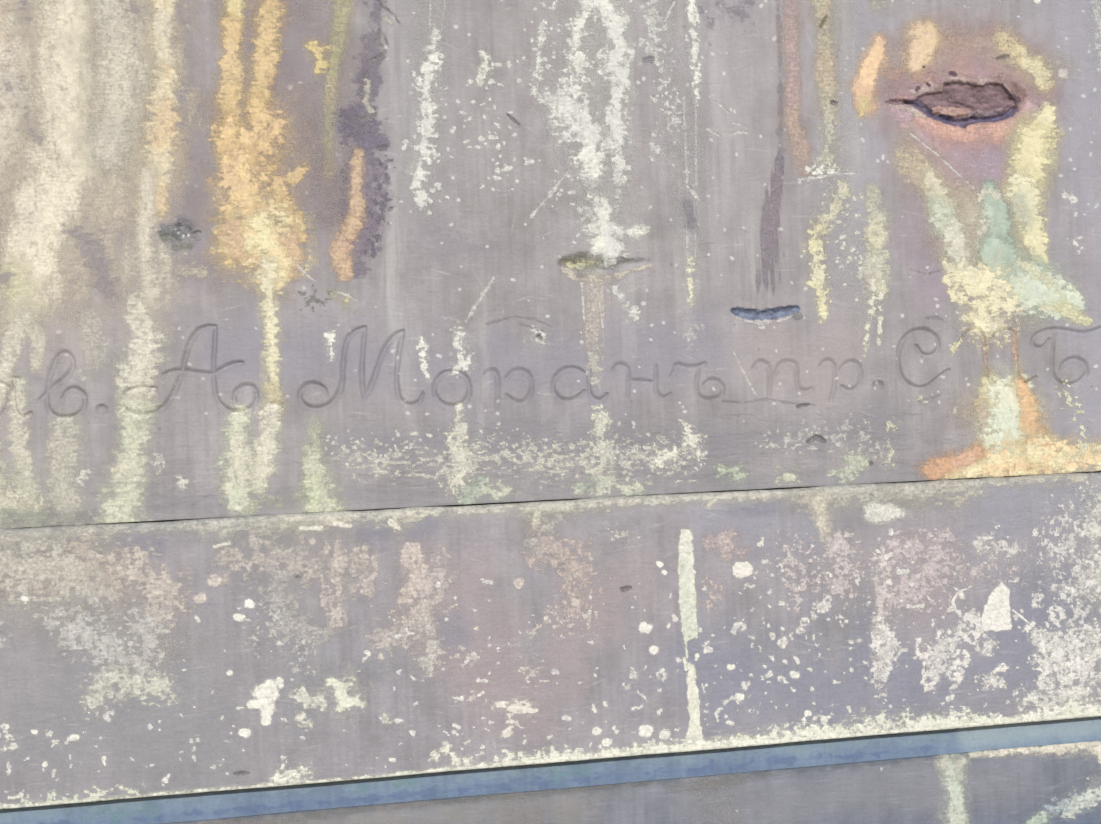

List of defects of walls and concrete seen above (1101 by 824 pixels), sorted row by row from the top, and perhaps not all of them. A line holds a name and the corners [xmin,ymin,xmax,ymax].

damp [237,0,262,130]
corrosion [207,0,313,494]
corrosion [304,0,351,162]
corrosion [298,149,366,310]
damp [252,0,713,388]
spalling [730,305,802,326]
damp [756,153,784,293]
corrosion [782,0,1063,358]
spalling [885,71,1026,128]
corrosion [921,329,1101,480]